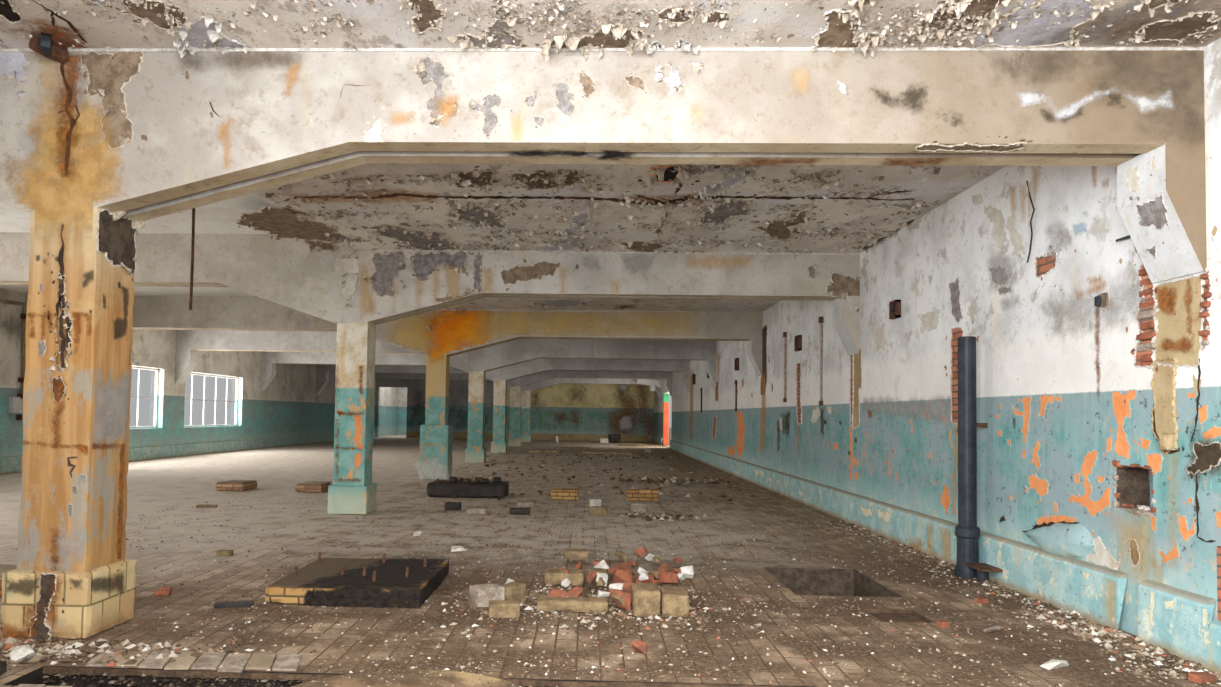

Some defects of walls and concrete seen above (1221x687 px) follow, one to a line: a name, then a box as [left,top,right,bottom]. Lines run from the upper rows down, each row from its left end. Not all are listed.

corrosion [58,55,79,176]
crack [58,63,80,177]
peeling [0,0,1220,150]
crack [55,224,70,368]
crack [284,173,915,205]
peeling [265,136,1033,336]
flaking render [971,194,1076,296]
corrosion [335,411,363,481]
flaking render [918,276,979,442]
spalling [995,156,1221,598]
crack [1151,358,1202,454]
crack [1194,477,1215,543]